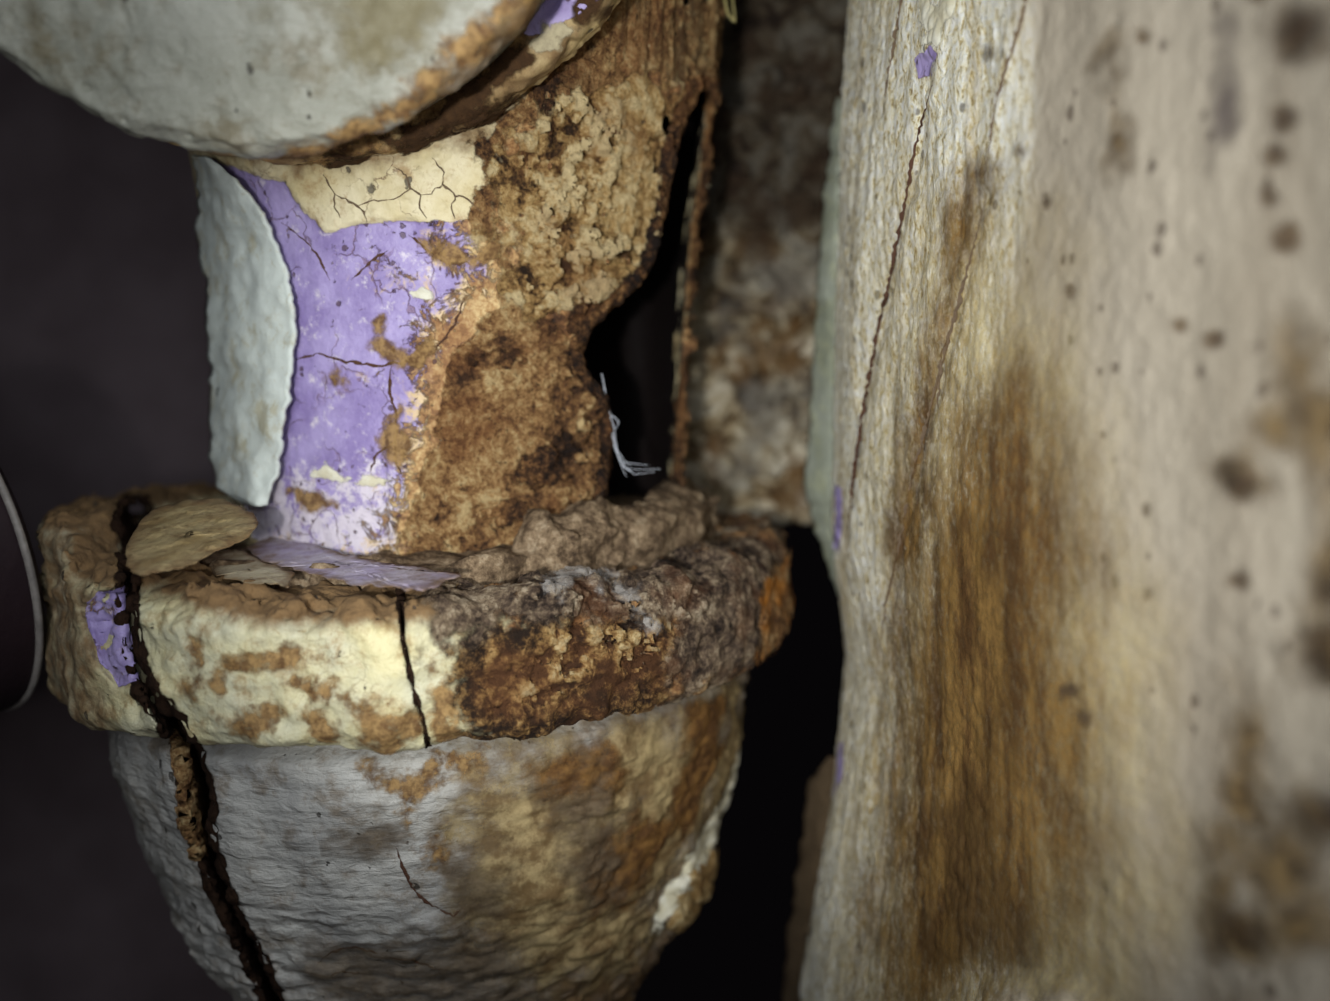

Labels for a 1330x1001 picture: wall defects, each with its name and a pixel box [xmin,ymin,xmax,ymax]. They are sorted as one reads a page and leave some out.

rust [287,0,537,168]
leakage [1266,106,1295,165]
leakage [1276,11,1323,58]
crack [282,158,482,280]
rust [401,0,726,556]
leakage [1273,223,1299,251]
crack [295,353,398,415]
peeling [191,154,520,588]
crack [110,493,284,1001]
crack [395,588,431,748]
rust [755,550,794,664]
leakage [861,165,1131,1001]